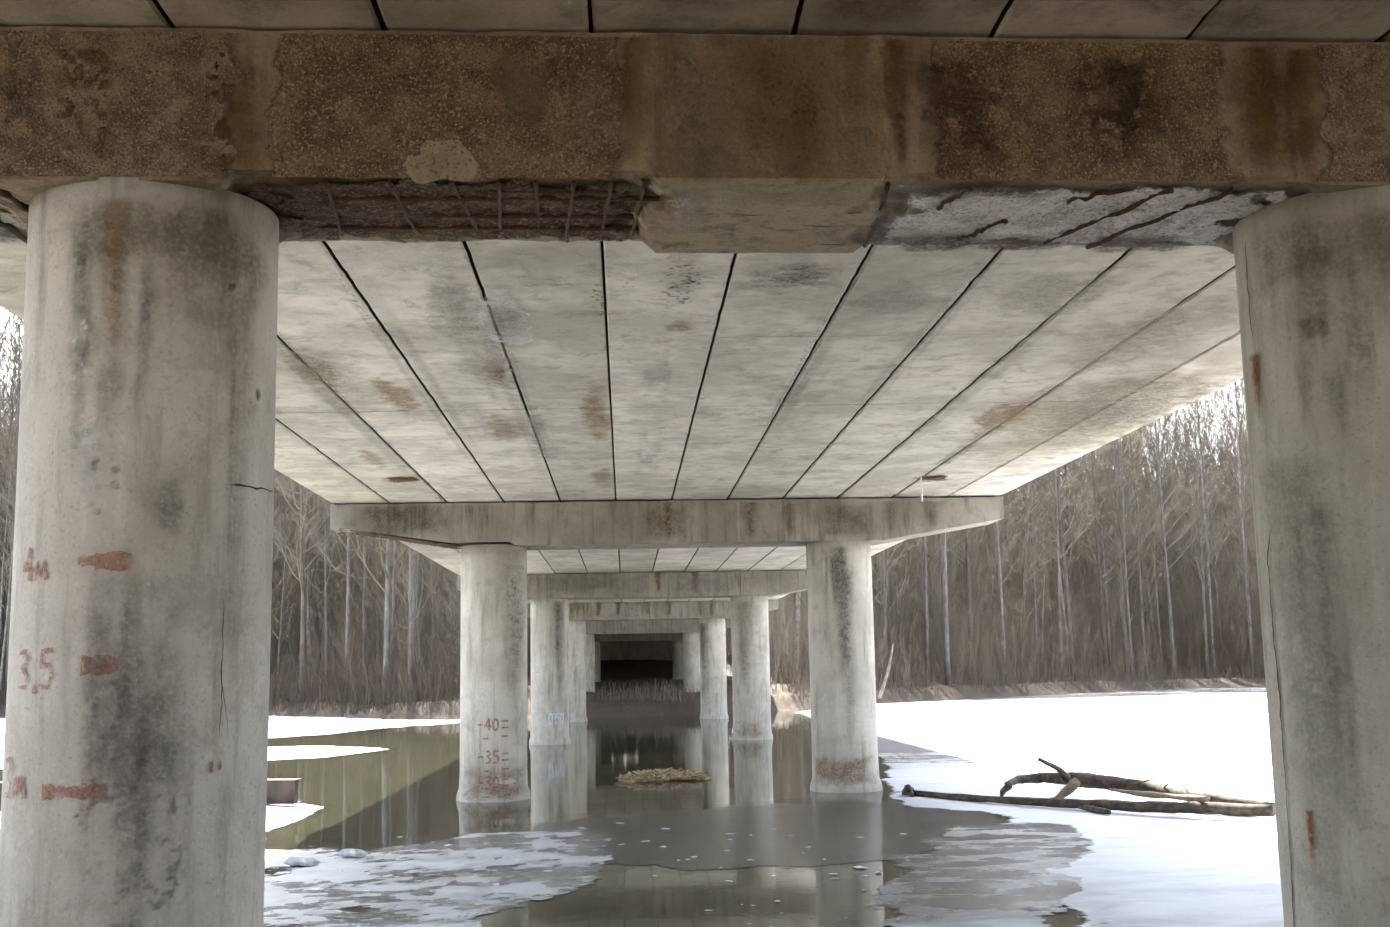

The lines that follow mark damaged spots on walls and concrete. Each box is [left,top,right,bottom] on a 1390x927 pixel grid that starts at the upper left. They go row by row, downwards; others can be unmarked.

peeling [0,30,246,244]
peeling [243,33,678,247]
crack [227,484,272,492]